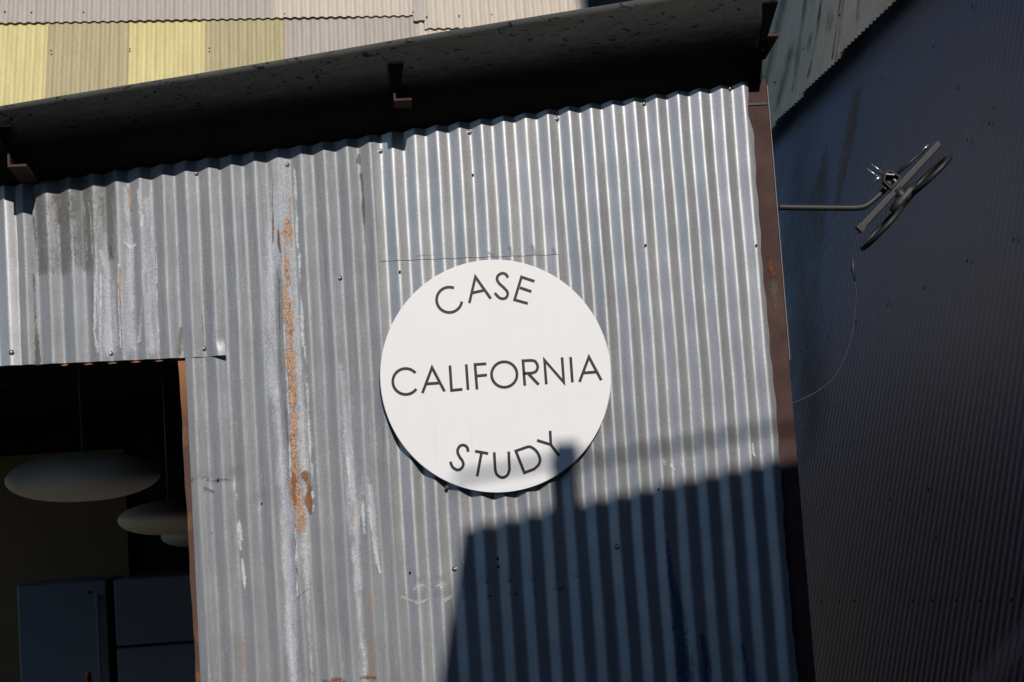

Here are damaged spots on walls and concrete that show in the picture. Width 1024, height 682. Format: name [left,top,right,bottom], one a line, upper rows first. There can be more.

rust [277,219,315,533]